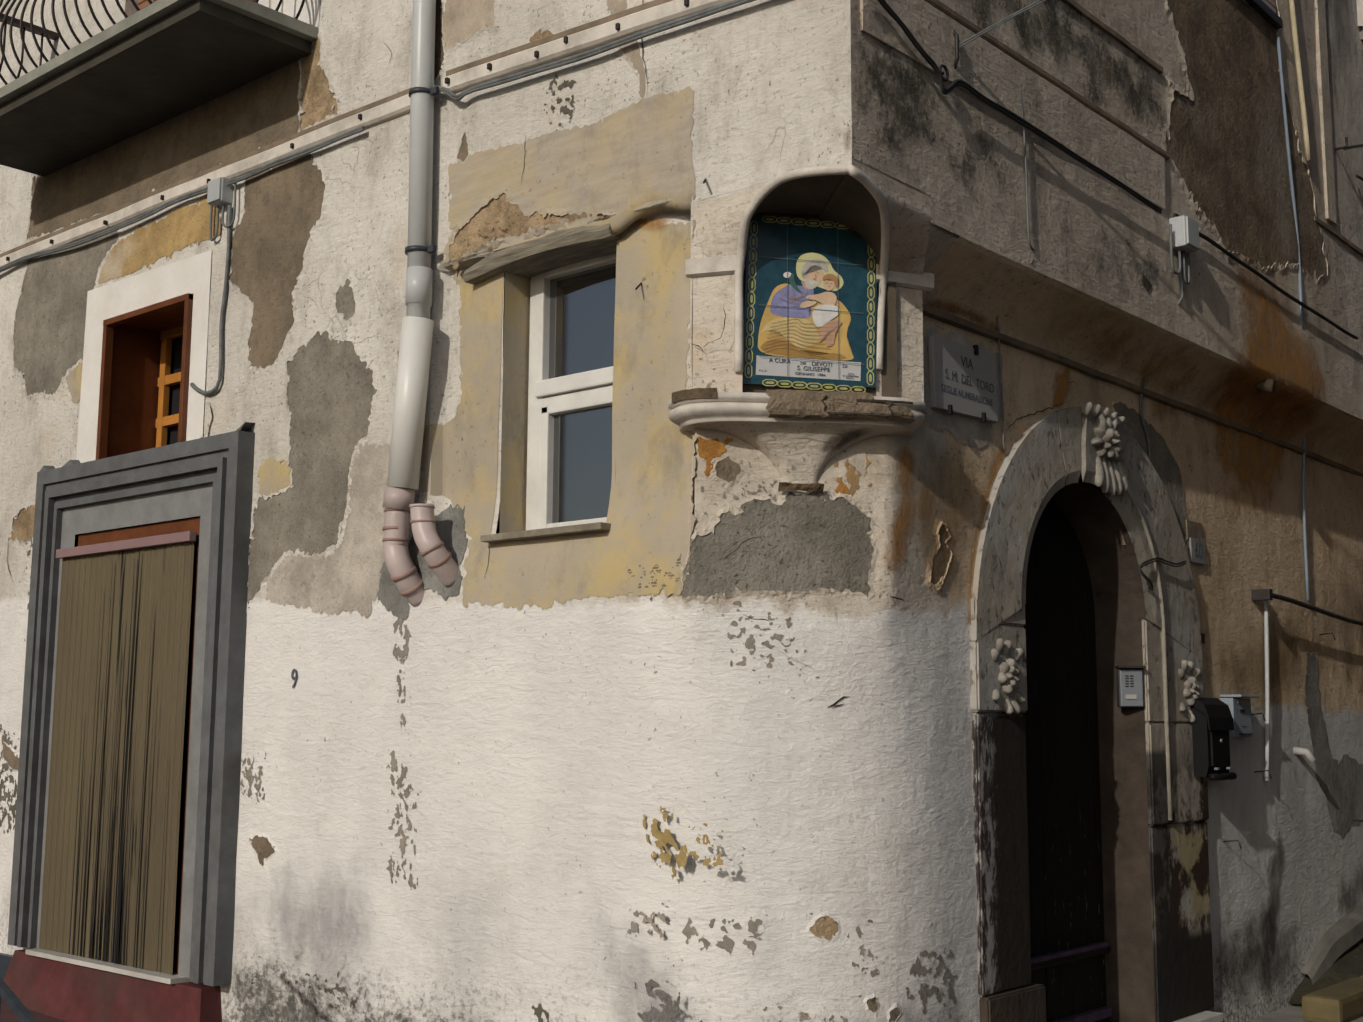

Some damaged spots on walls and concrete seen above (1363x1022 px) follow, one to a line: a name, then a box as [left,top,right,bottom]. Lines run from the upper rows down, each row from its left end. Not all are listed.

flaking render [27,28,344,243]
peeling [439,39,695,285]
damp [863,42,935,150]
damp [973,0,1163,128]
flaking render [1160,0,1331,290]
peeling [10,229,123,402]
peeling [227,151,390,622]
spalling [627,442,879,684]
peeling [386,749,419,890]
damp [236,959,412,1022]
peeling [682,909,768,965]
peeling [799,911,957,1022]